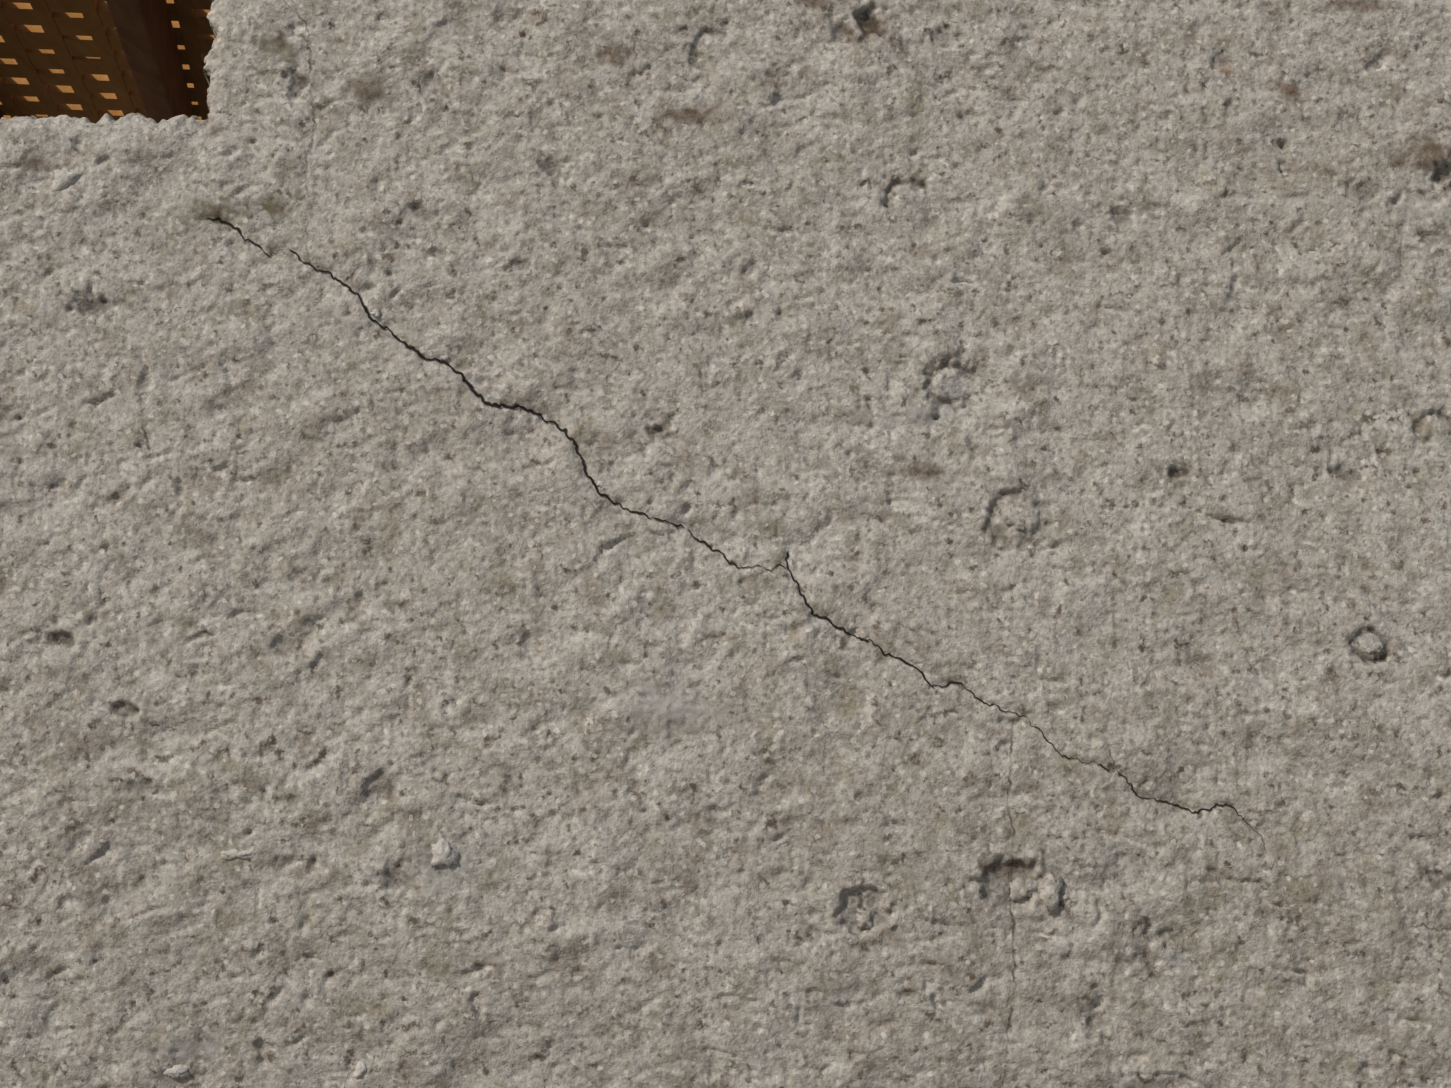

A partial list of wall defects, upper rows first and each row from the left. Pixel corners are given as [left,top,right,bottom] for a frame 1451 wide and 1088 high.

crack [206,217,1266,1033]